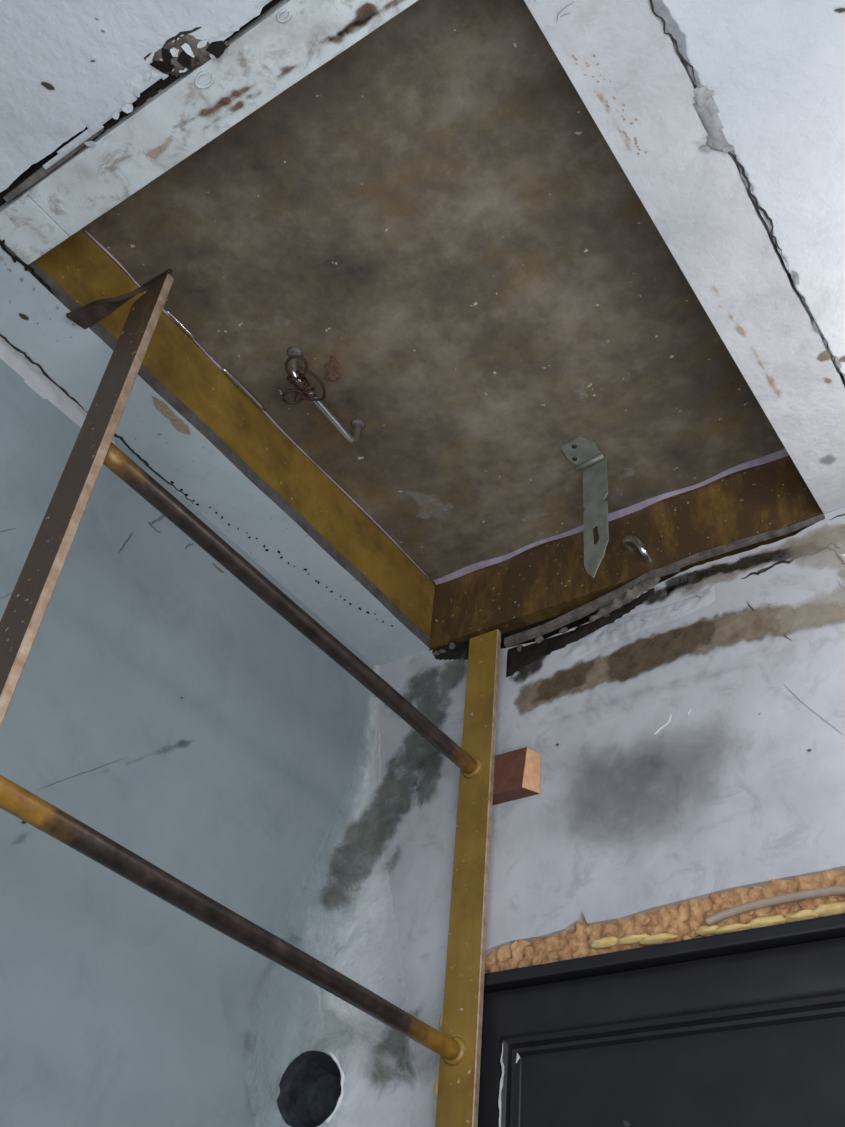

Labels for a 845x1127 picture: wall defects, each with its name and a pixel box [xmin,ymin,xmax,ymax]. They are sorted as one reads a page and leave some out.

peeling [43,0,272,169]
crack [144,27,201,60]
rust [199,87,251,116]
crack [649,0,705,110]
rust [148,143,167,159]
crack [733,151,845,377]
damp [643,527,845,604]
crack [741,514,845,610]
damp [405,654,465,728]
peeling [563,577,716,661]
damp [514,604,845,714]
damp [324,730,443,906]